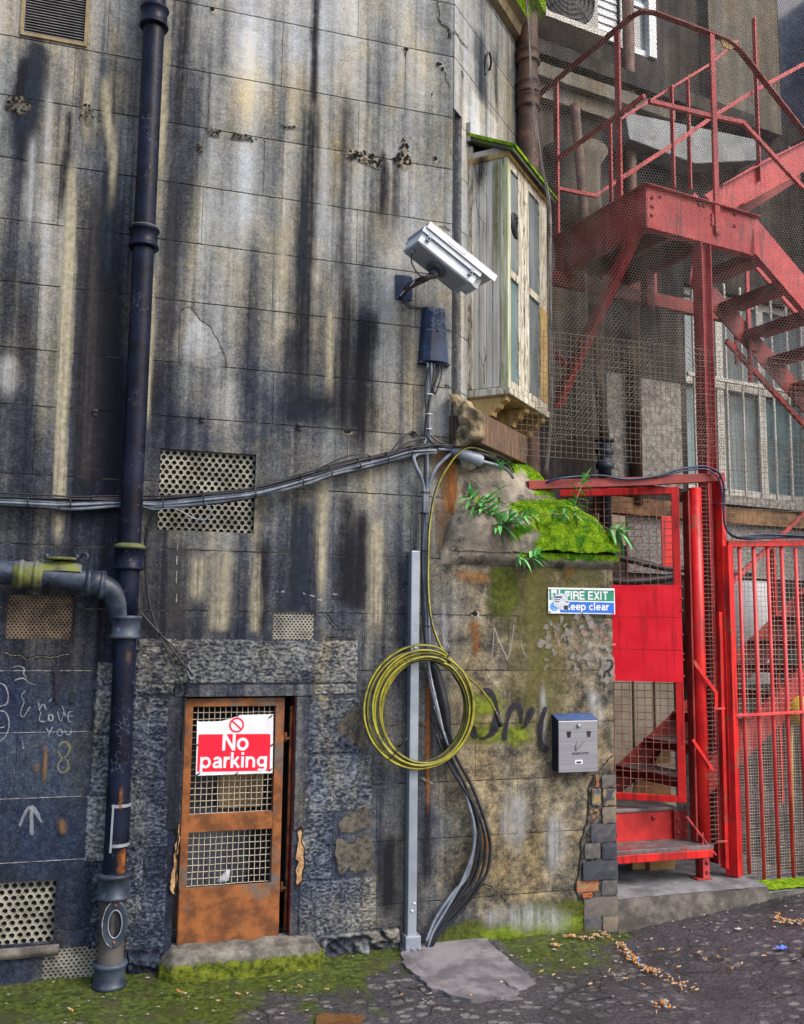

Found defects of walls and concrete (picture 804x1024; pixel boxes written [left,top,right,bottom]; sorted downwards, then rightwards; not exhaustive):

leakage [159,0,191,168]
spalling [197,127,257,153]
leakage [279,0,326,361]
spalling [346,138,413,170]
leakage [379,154,400,217]
leakage [54,68,117,498]
leakage [327,108,377,447]
corrosion [443,455,457,512]
leakage [336,499,382,621]
peeling [538,614,616,684]
spalling [169,822,180,895]
spalling [296,826,306,888]